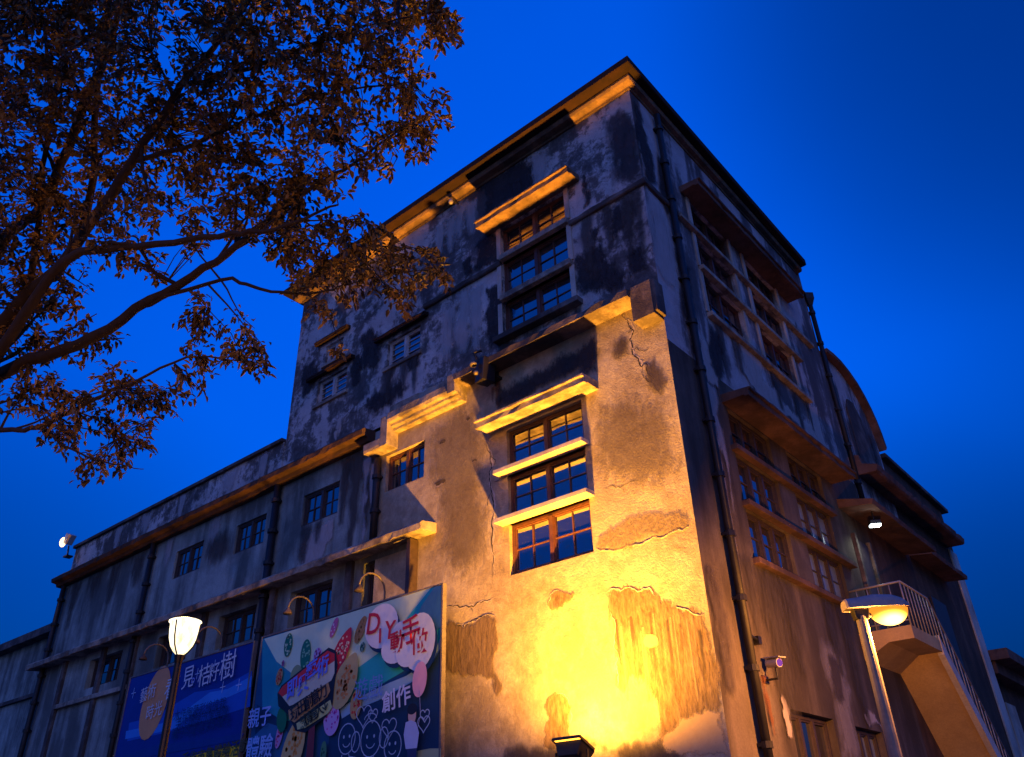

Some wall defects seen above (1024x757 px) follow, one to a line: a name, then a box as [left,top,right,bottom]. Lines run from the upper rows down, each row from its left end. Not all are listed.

damp [558,104,670,322]
damp [301,361,317,398]
damp [350,328,419,413]
crack [622,315,660,394]
damp [646,361,667,393]
peeling [597,510,688,552]
peeling [548,590,574,610]
peeling [446,614,502,695]
peeling [608,585,721,744]